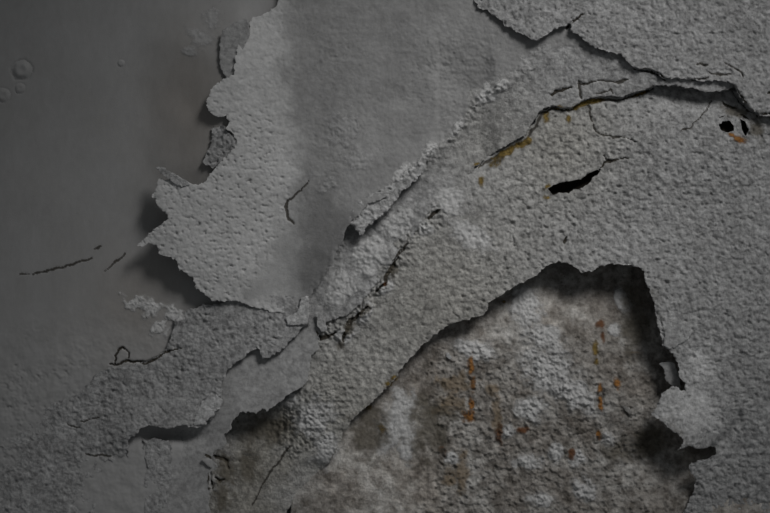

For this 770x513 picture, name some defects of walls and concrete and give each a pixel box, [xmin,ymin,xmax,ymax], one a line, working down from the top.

peeling [137,0,770,322]
rust [474,137,532,167]
crack [478,68,666,168]
rust [566,98,604,122]
crack [681,62,770,131]
crack [284,180,309,224]
crack [19,245,126,275]
crack [316,243,408,342]
peeling [143,85,770,513]
crack [109,346,182,366]
rust [593,320,605,364]
peeling [0,294,312,513]